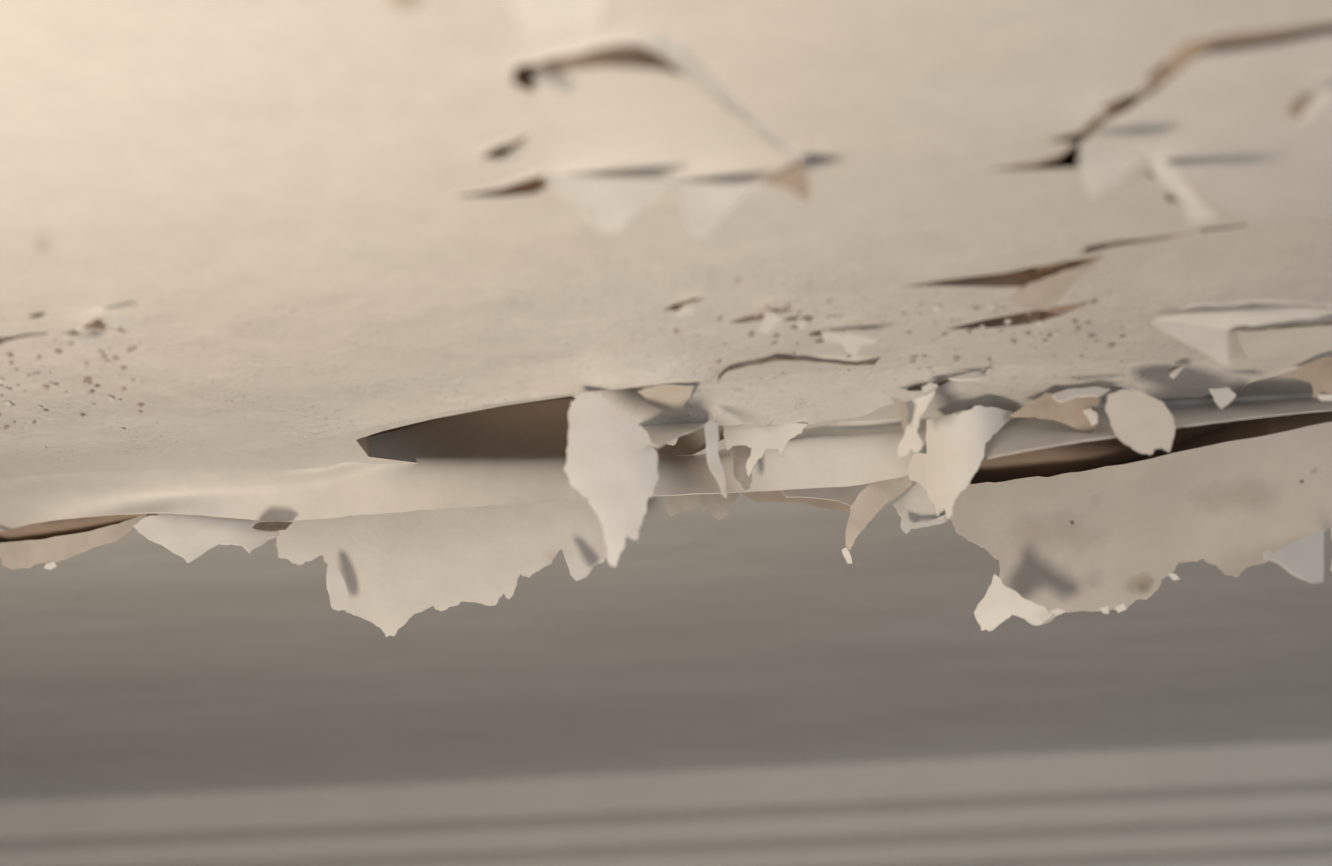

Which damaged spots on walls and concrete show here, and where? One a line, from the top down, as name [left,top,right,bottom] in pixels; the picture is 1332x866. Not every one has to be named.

peeling [0,24,1332,637]